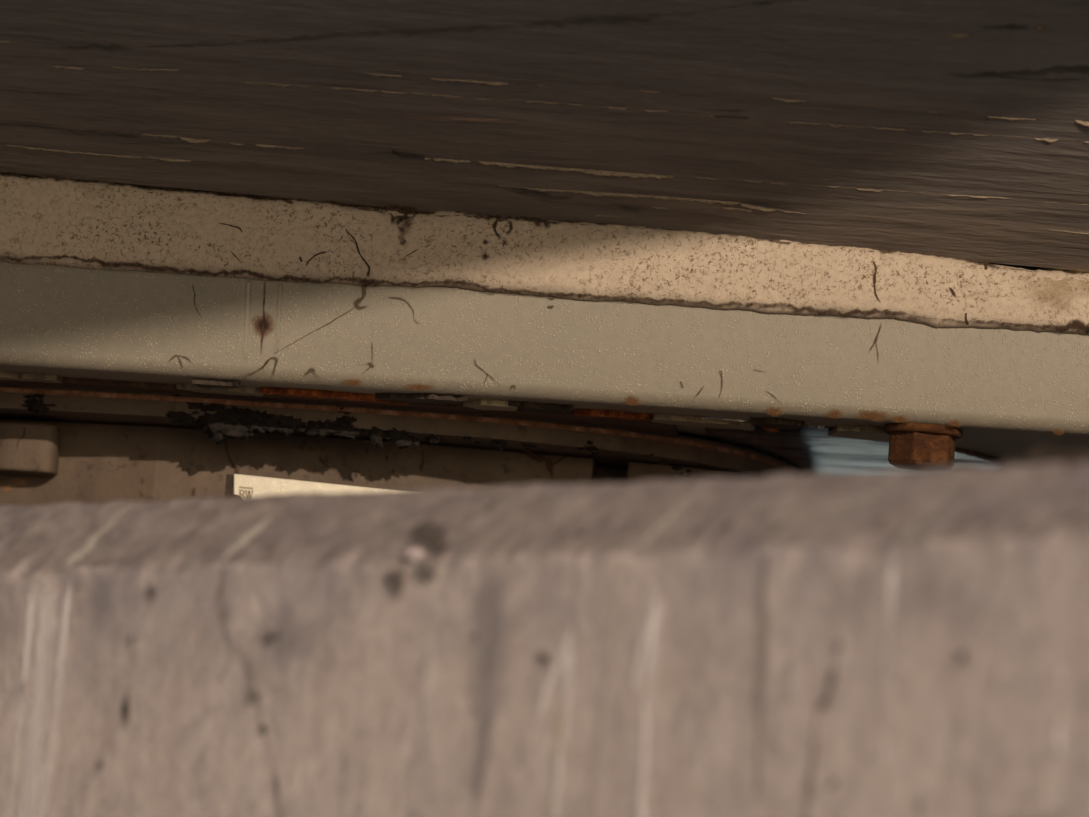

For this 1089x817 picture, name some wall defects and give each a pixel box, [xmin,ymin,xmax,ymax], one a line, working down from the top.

rust [255,317,271,334]
damp [21,588,70,791]